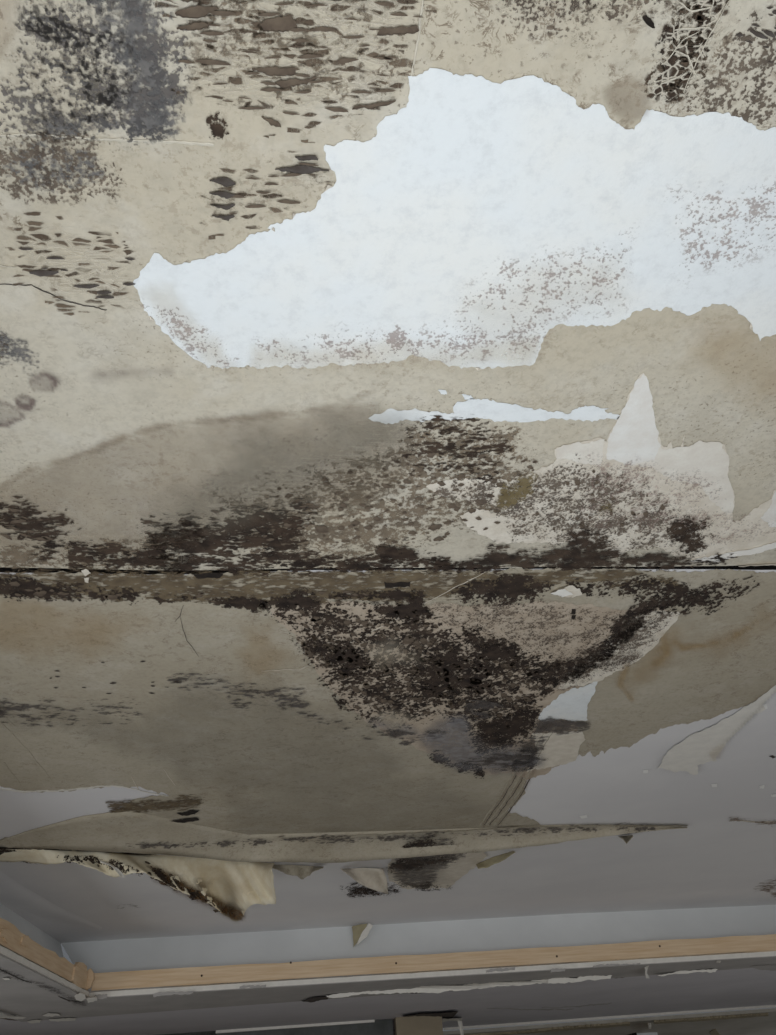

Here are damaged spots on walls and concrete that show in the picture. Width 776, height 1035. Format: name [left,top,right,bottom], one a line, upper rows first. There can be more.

damp [0,0,190,204]
crack [155,0,437,240]
damp [497,0,690,38]
crack [644,0,730,103]
damp [678,7,776,128]
peeling [133,68,776,370]
peeling [368,373,776,563]
crack [82,569,90,583]
damp [0,411,759,780]
crack [384,566,522,605]
peeling [538,681,598,721]
peeling [0,847,324,921]